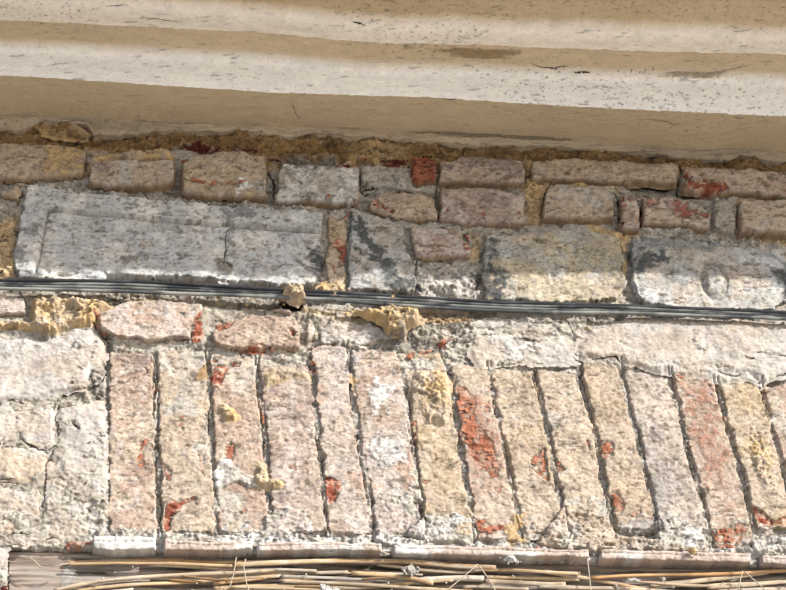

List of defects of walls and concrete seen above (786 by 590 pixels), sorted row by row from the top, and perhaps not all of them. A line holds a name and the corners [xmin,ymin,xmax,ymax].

spalling [181,140,287,165]
spalling [618,171,728,219]
spalling [191,310,205,344]
spalling [209,342,276,388]
spalling [406,338,456,360]
crack [718,351,786,393]
crack [0,373,107,517]
spalling [456,386,501,479]
spalling [322,477,341,505]
spalling [163,496,196,531]
spalling [476,519,507,535]
spalling [712,504,786,549]